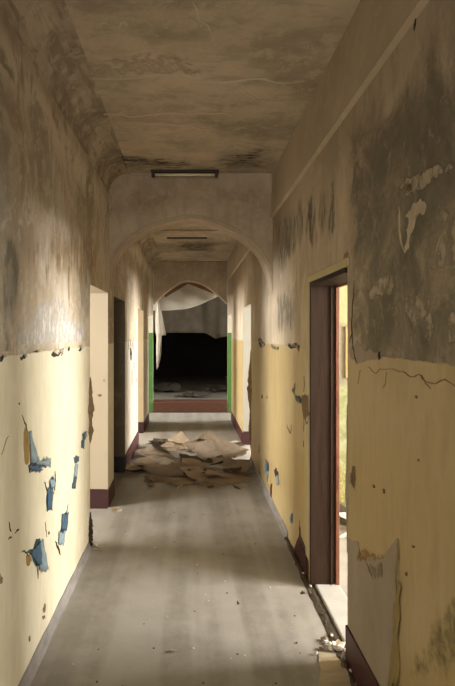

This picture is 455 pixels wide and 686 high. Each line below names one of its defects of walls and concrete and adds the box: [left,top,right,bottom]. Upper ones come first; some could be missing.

peeling [398,163,454,253]
water stain [4,240,17,308]
efflorescence [17,301,84,345]
peeling [20,345,83,361]
crack [350,289,455,389]
peeling [22,416,59,512]
spalling [72,377,102,489]
peeling [21,507,69,577]
peeling [289,513,309,581]
peeling [345,405,407,686]